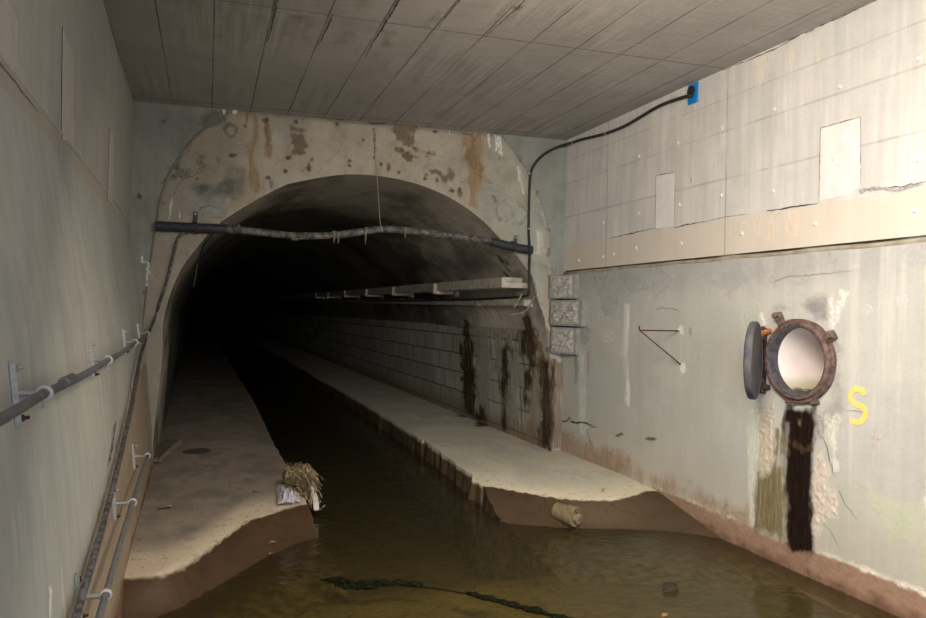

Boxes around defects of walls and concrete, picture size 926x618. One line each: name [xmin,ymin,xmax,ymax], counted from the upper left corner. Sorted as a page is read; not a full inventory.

rust [462,132,483,206]
water stain [807,293,846,329]
water stain [459,313,563,451]
peeling [759,404,776,476]
water stain [654,395,926,618]